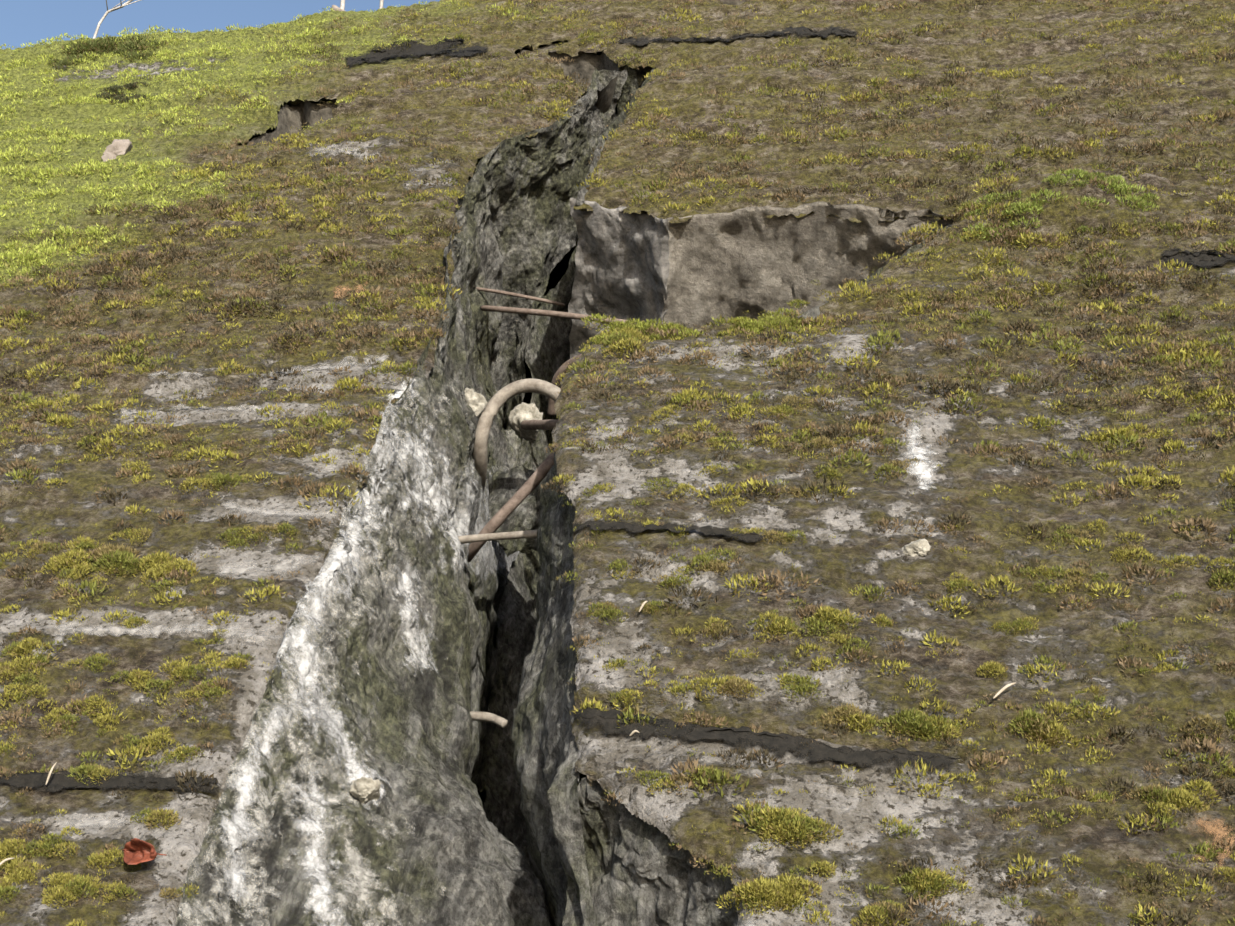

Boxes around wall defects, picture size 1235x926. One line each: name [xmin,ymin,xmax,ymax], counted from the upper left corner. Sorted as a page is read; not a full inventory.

spalling [237,99,386,163]
spalling [568,198,957,359]
crack [1160,248,1235,268]
crack [0,0,959,926]